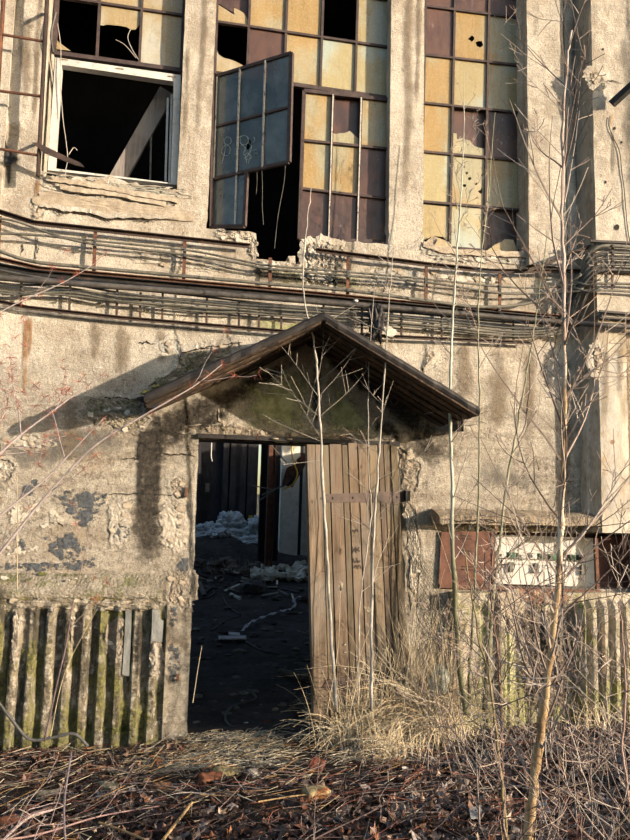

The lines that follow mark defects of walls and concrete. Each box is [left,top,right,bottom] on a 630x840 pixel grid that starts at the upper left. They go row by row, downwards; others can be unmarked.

spalling [29,202,51,226]
peeling [35,171,198,209]
spalling [214,227,352,293]
rust [23,320,32,359]
spalling [72,332,247,440]
spalling [0,429,132,582]
water stain [133,423,166,561]
spalling [0,469,199,670]
water stain [5,617,13,700]